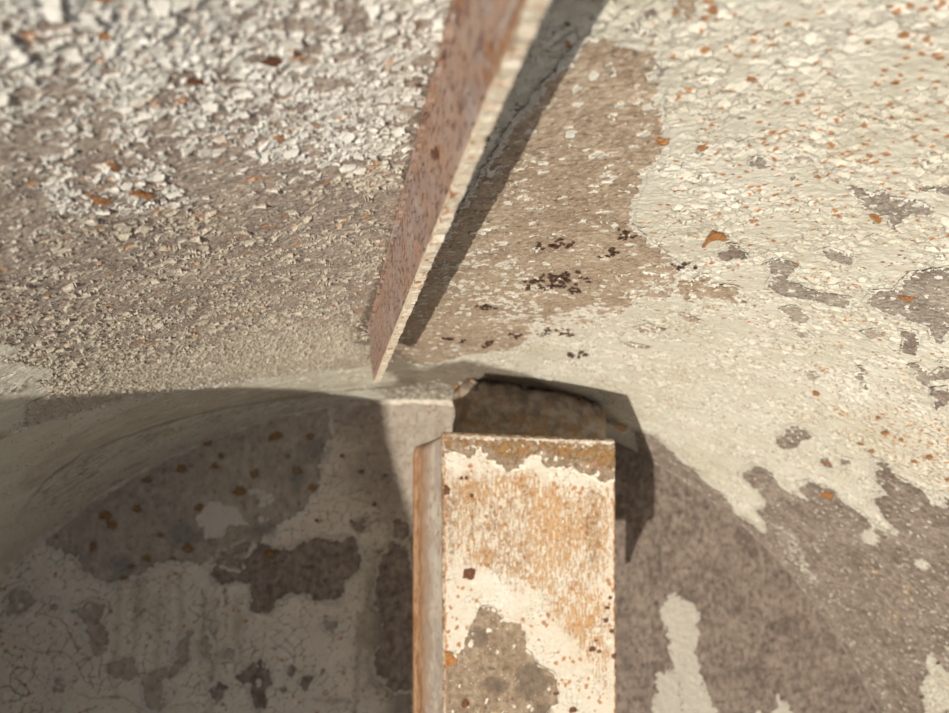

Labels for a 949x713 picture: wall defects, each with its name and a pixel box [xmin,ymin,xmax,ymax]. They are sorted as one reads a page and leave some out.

corrosion [186,77,205,85]
corrosion [260,56,283,68]
peeling [0,0,455,427]
corrosion [702,231,727,248]
peeling [818,246,854,267]
peeling [765,257,949,413]
corrosion [380,350,588,400]
corrosion [444,436,615,467]
peeling [775,423,816,452]
peeling [25,379,454,713]
corrosion [444,472,616,671]
peeling [444,429,949,713]